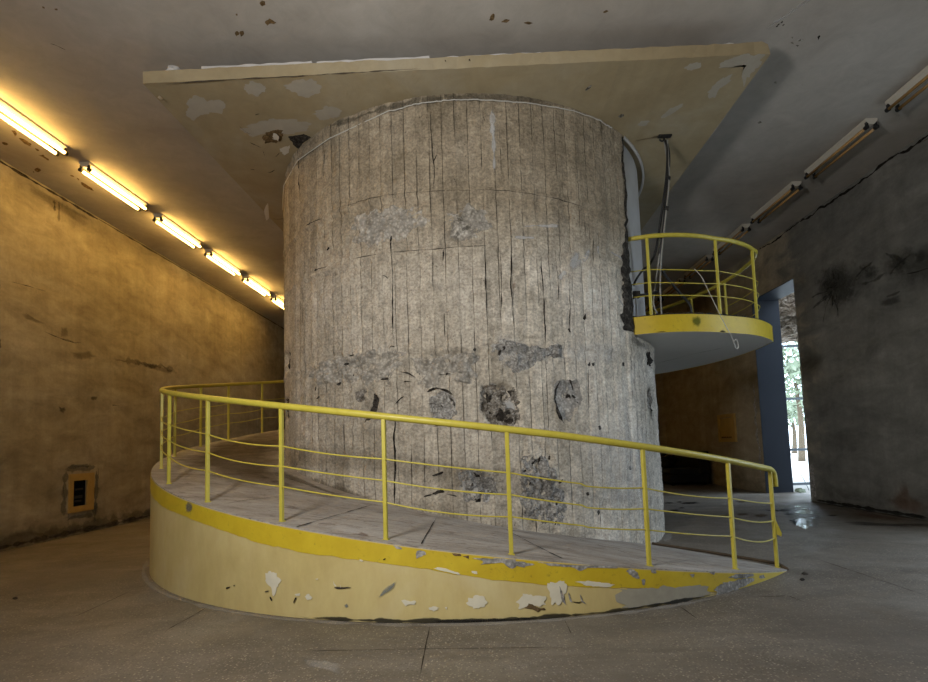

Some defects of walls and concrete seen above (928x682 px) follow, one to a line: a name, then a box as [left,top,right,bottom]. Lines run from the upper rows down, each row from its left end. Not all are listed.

spalling [620,137,634,333]
spalling [491,338,564,373]
spalling [307,346,521,427]
spalling [554,379,583,423]
spalling [519,450,567,526]
peeling [265,571,281,596]
peeling [452,553,765,612]